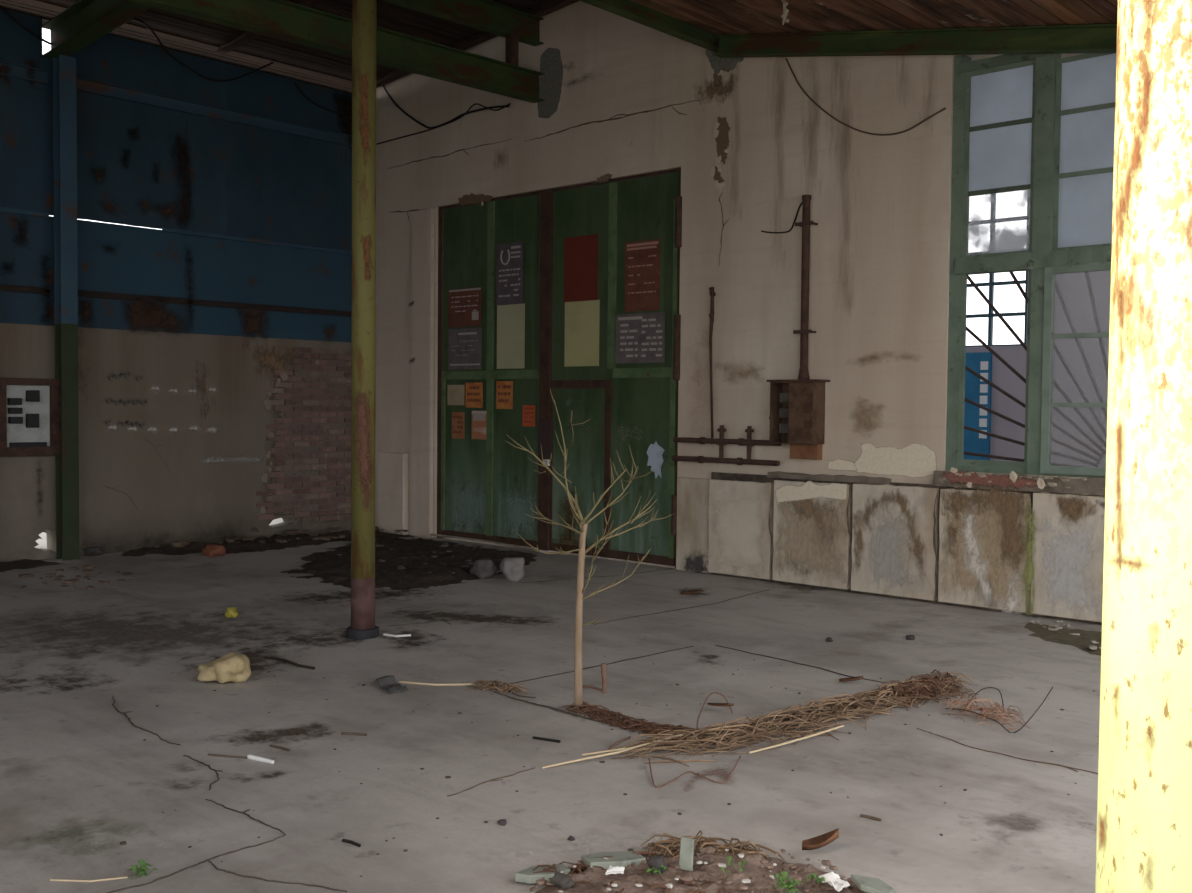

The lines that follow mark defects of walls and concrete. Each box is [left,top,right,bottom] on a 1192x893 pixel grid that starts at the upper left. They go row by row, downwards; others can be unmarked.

corrosion [1142,0,1152,30]
corrosion [334,75,370,162]
crack [388,100,700,169]
peeling [710,117,730,194]
corrosion [1119,63,1151,232]
damp [778,491,923,590]
damp [942,485,1105,612]
corrosion [1116,424,1141,568]